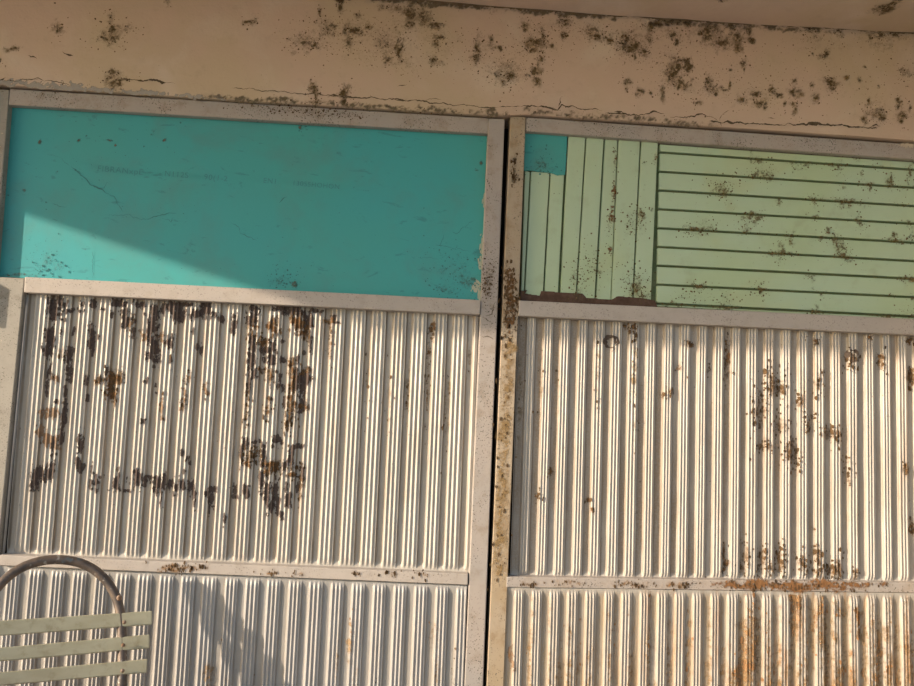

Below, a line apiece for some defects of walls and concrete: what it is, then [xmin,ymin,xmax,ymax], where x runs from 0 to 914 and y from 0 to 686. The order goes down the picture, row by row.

damp [80,9,144,52]
damp [280,0,914,128]
crack [235,85,878,129]
corrosion [245,309,335,368]
corrosion [35,405,62,450]
corrosion [94,364,125,407]
corrosion [242,357,310,447]
corrosion [487,259,526,590]
corrosion [746,359,857,486]
corrosion [906,366,914,391]
corrosion [239,445,305,509]
corrosion [614,533,914,686]